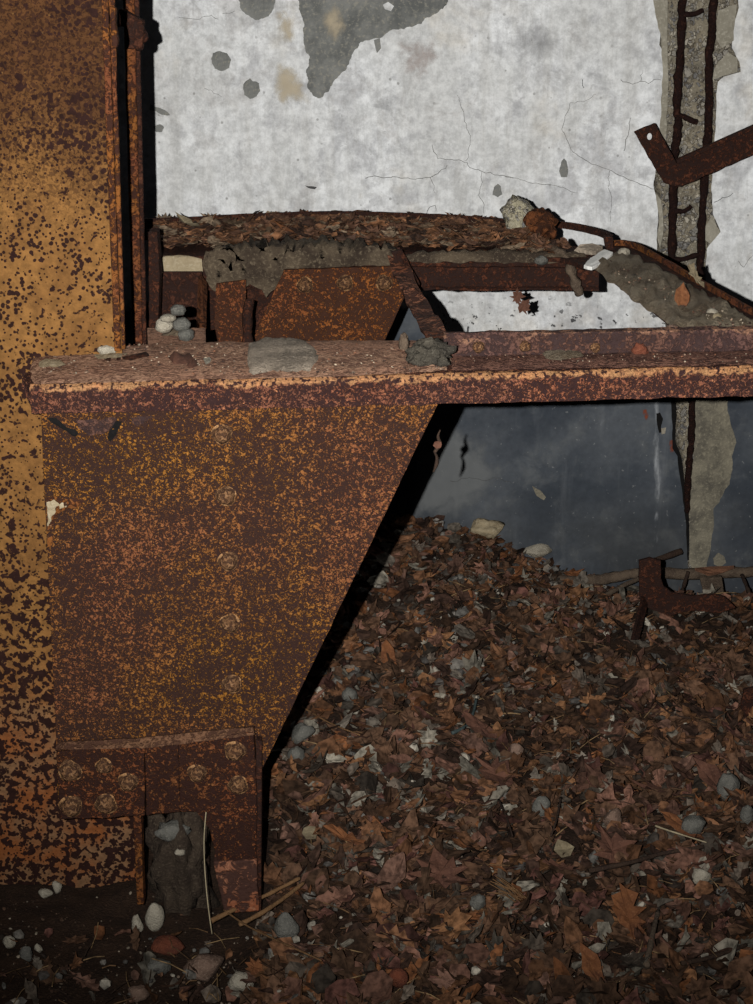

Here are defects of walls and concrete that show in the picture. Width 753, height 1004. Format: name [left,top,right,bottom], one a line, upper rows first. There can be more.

spalling [653,0,741,159]
crack [367,95,574,213]
crack [562,79,651,220]
spalling [653,171,720,281]
rust [94,352,150,361]
rust [168,351,211,368]
peeling [656,397,736,568]